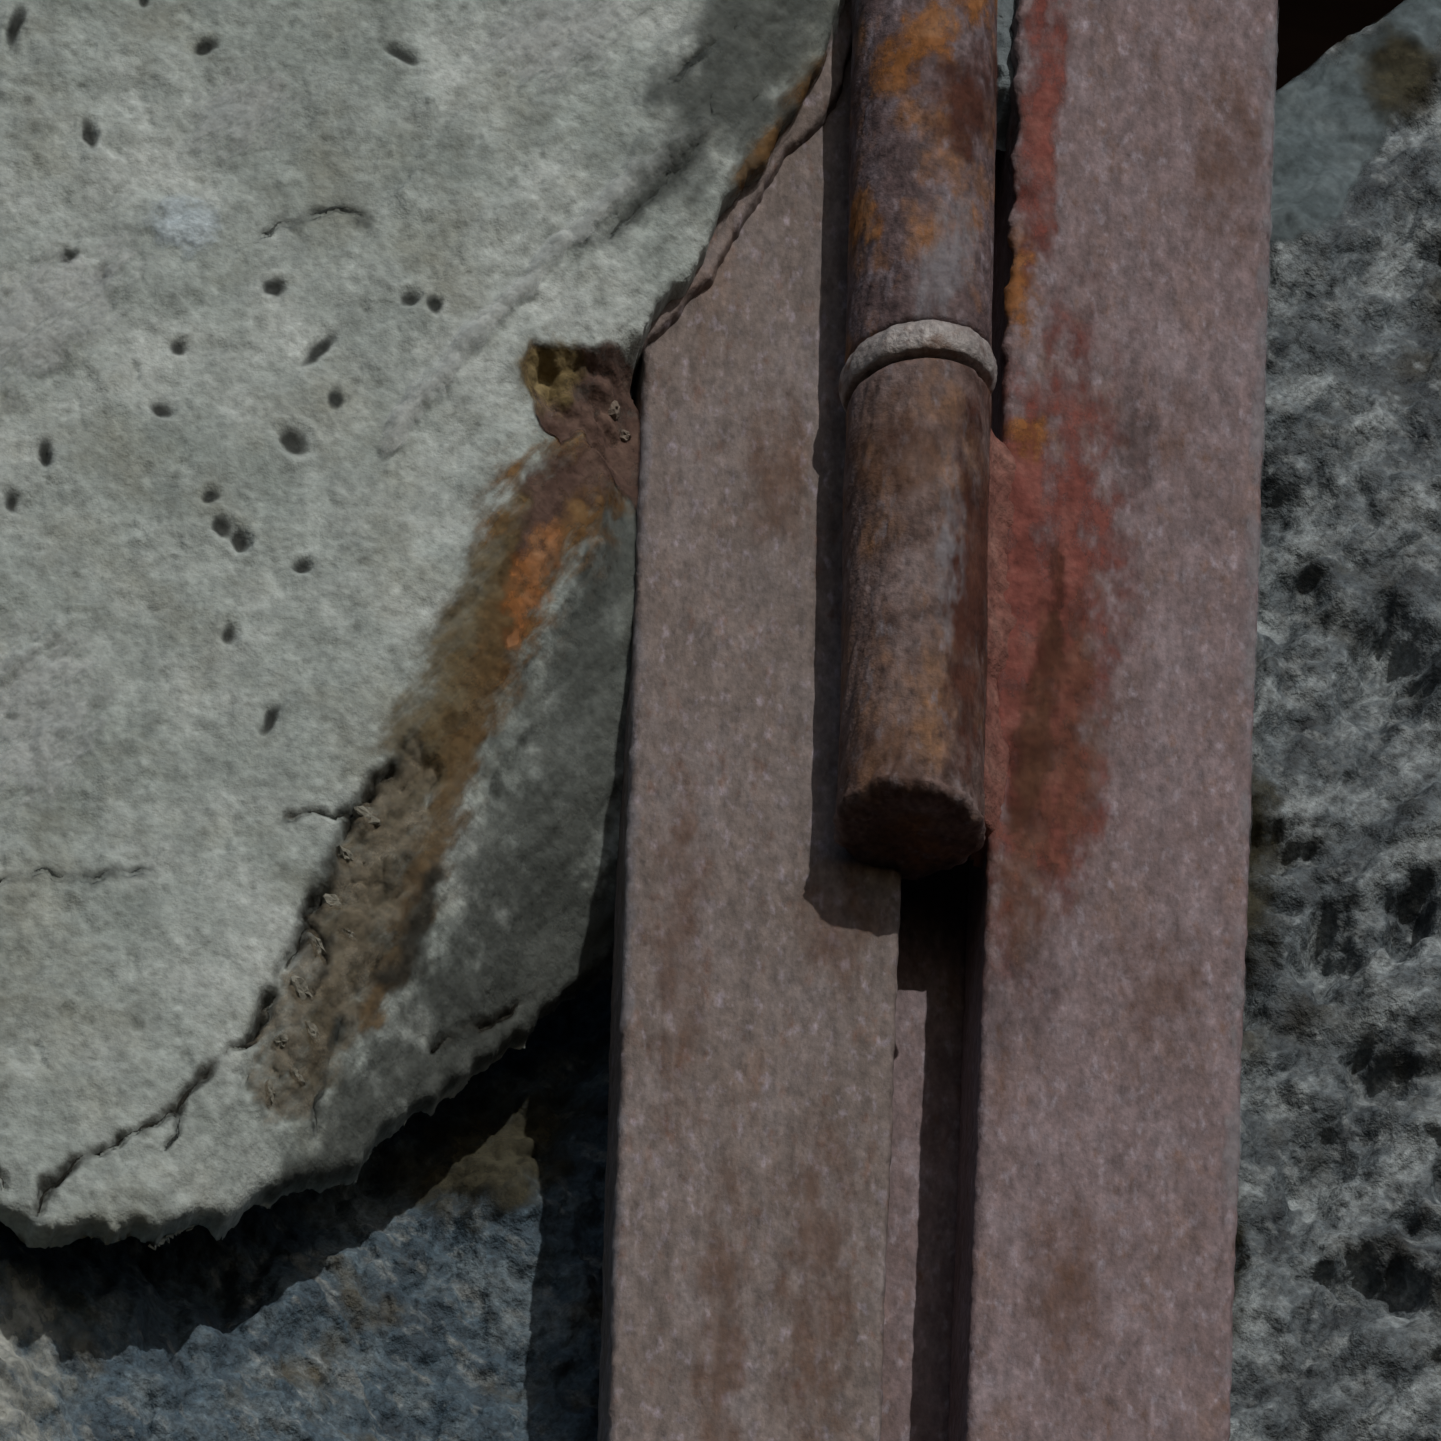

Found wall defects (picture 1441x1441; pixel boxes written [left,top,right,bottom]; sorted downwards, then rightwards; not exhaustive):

rust [848,187,881,246]
rust [870,0,998,159]
rust [1004,0,1068,336]
crack [0,865,146,883]
crack [35,764,399,1215]
rust [296,429,625,1086]
rust [945,372,1126,919]